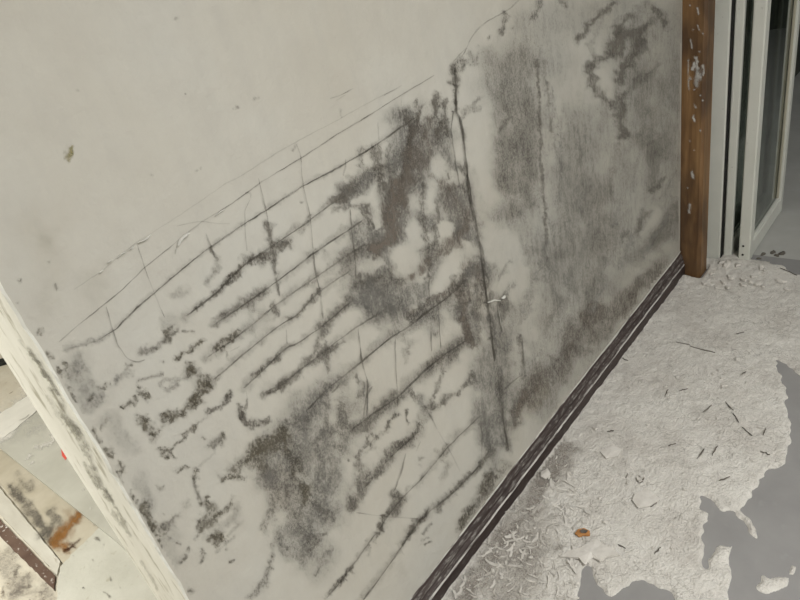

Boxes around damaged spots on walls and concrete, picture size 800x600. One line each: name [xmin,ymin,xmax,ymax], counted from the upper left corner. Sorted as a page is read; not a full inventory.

water stain [586,14,647,139]
crack [452,75,475,219]
crack [191,253,262,313]
water stain [223,222,290,285]
crack [272,212,361,285]
water stain [330,93,506,370]
crack [458,259,489,309]
water stain [161,341,270,426]
water stain [408,267,659,529]
water stain [221,387,331,551]
corrosion [51,512,82,552]
water stain [376,489,403,538]